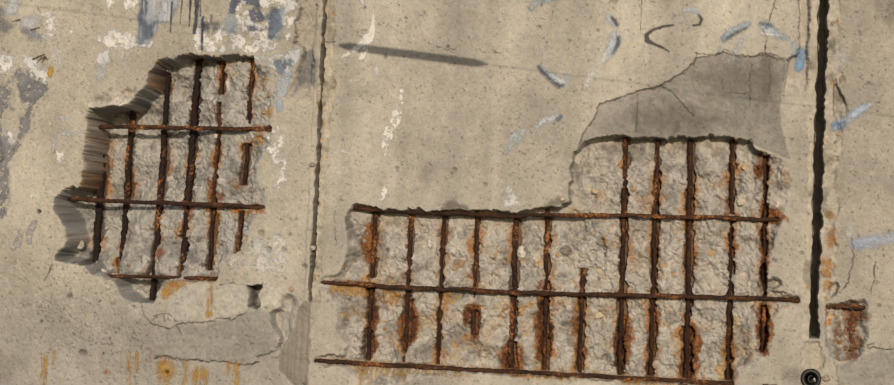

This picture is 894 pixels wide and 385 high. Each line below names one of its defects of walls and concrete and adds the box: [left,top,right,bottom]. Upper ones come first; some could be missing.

spalling [51,51,277,305]
spalling [282,0,820,385]
spalling [818,0,871,363]
rust [759,200,788,282]
spalling [269,291,301,353]
rust [331,285,400,353]
rust [397,299,419,346]
rust [463,303,482,339]
rust [534,281,554,359]
rust [613,315,634,369]
rust [682,322,703,379]
rust [756,302,774,355]